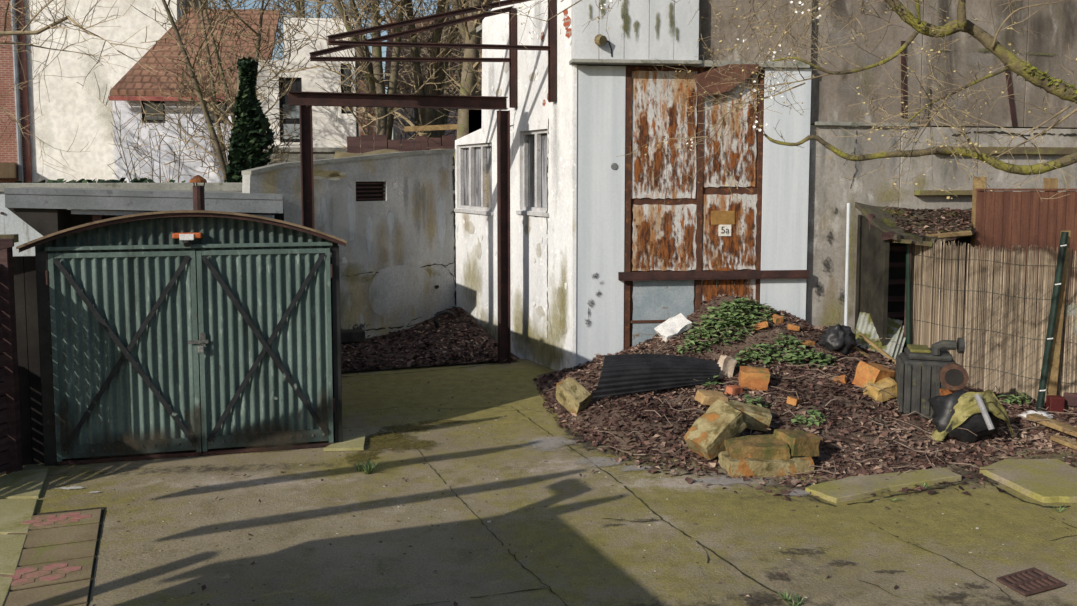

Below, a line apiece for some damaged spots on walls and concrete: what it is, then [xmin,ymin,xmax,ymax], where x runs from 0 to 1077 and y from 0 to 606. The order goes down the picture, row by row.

water stain [622,14,639,39]
water stain [655,3,678,40]
rust [634,64,759,195]
rust [635,201,754,303]